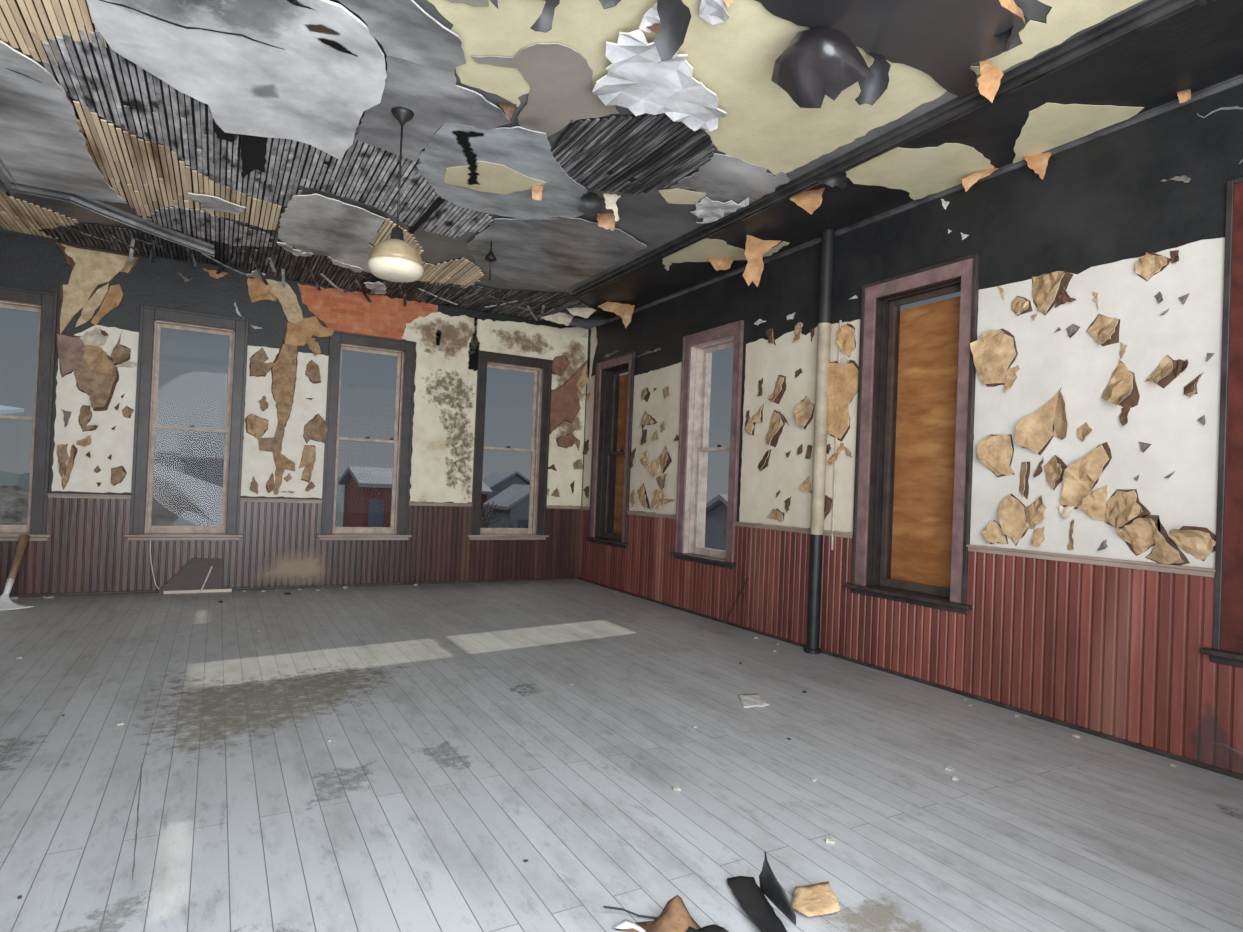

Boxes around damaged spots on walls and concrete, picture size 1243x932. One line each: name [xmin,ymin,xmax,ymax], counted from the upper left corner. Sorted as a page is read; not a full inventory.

flaking render [213,123,268,178]
peeling [444,161,546,201]
peeling [427,0,947,175]
peeling [789,143,998,215]
peeling [970,0,1143,103]
peeling [1013,103,1144,180]
peeling [662,235,789,287]
peeling [57,243,138,488]
flaking render [246,278,635,506]
damp [426,370,474,494]
peeling [976,389,1216,564]
peeling [1054,292,1214,427]